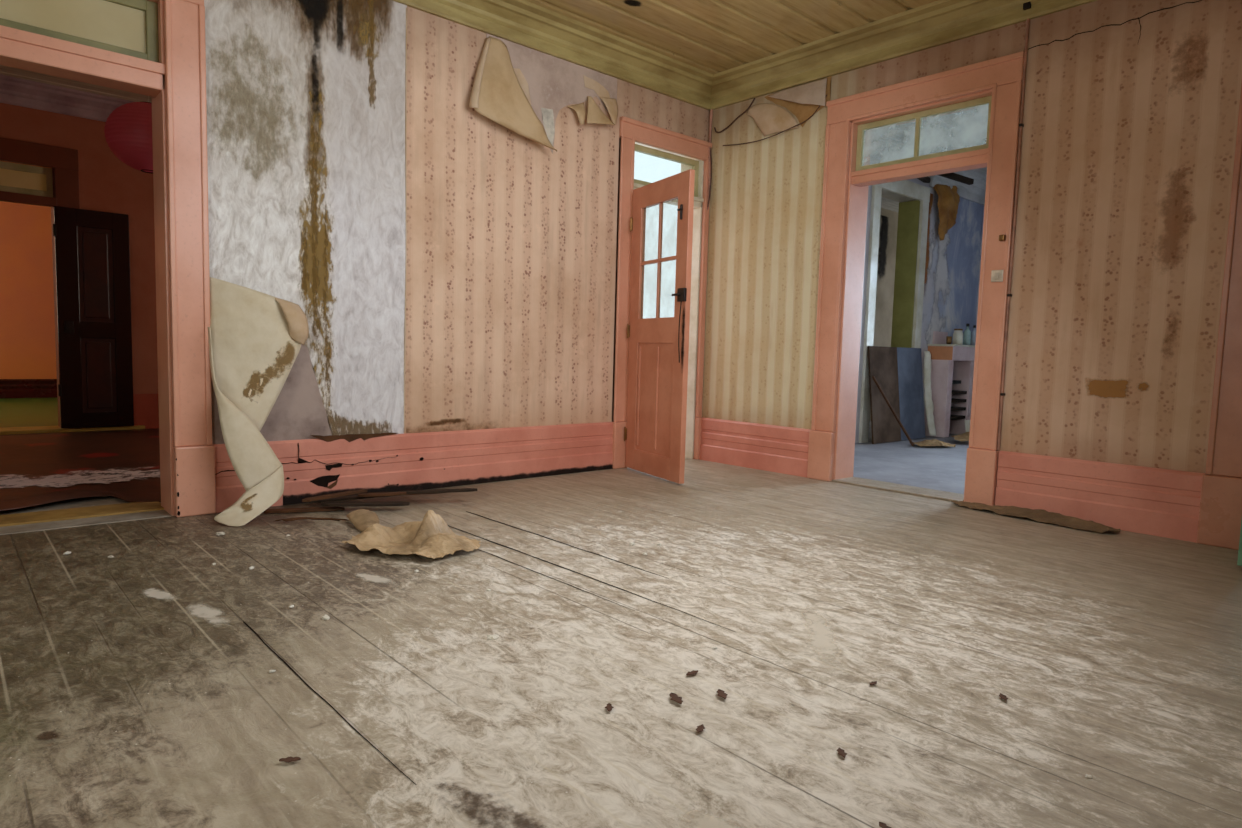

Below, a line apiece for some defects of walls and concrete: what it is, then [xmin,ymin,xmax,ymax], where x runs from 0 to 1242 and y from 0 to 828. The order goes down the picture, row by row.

damp [219,37,282,177]
damp [272,0,391,172]
flaking render [469,34,618,154]
peeling [765,76,832,127]
flaking render [204,0,407,527]
damp [326,410,392,435]